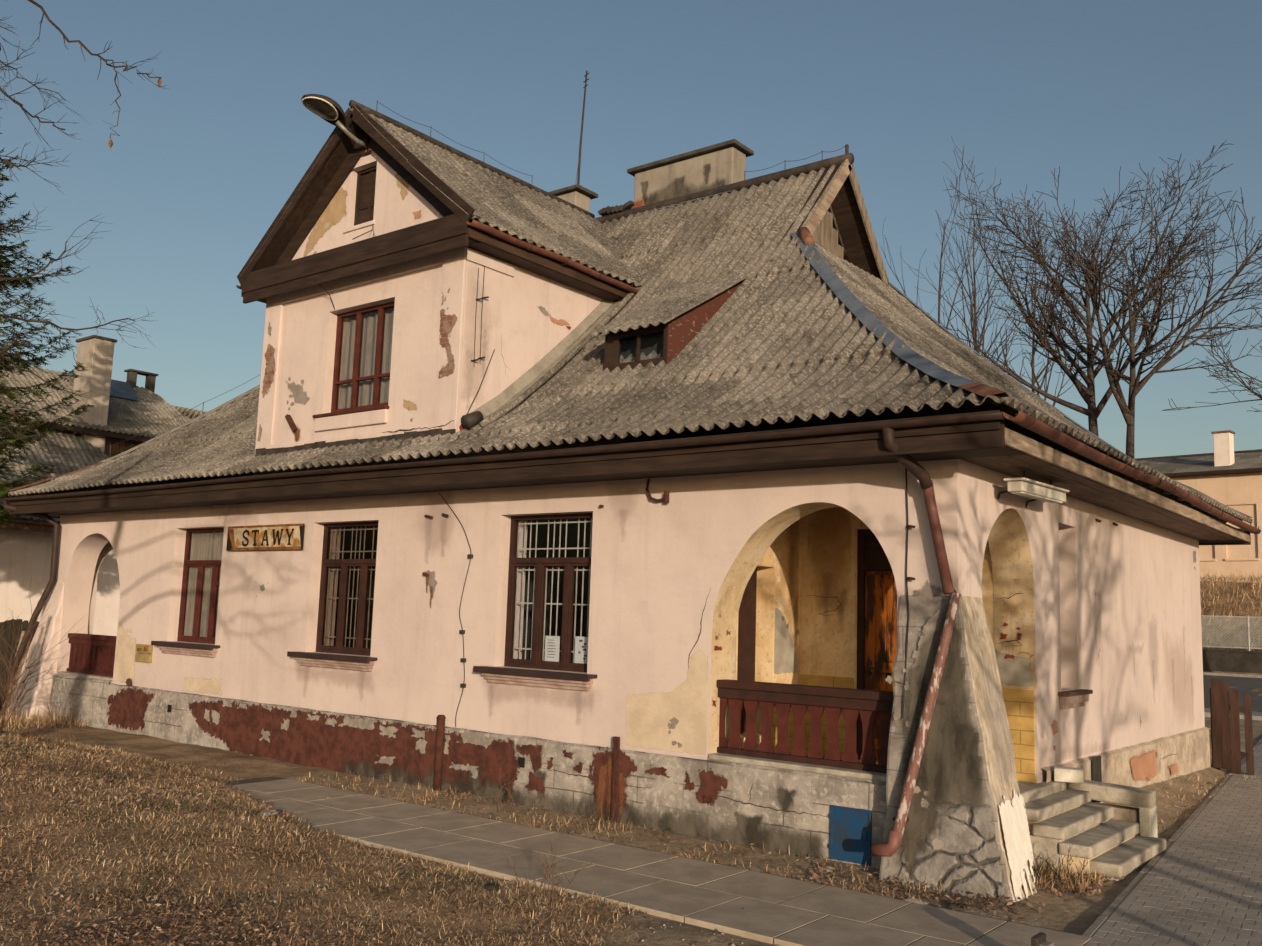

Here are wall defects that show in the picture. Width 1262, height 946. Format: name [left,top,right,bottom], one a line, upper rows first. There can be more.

peeling [184,675,583,797]